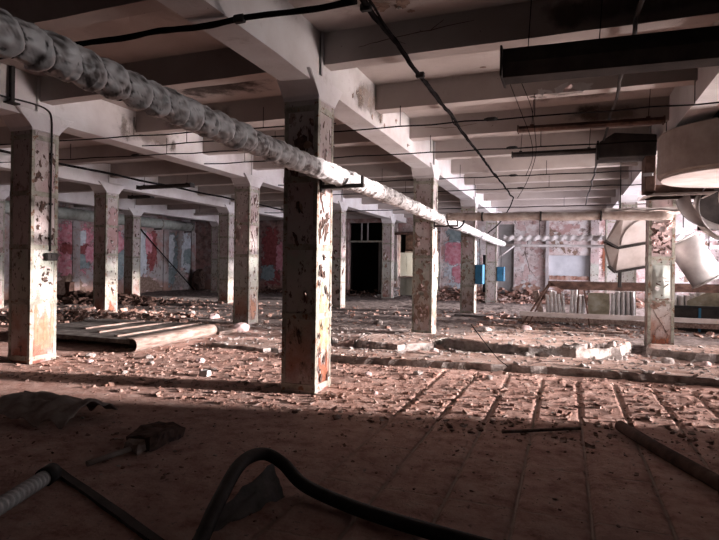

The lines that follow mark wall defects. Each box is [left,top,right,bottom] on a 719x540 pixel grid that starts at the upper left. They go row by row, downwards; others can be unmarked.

peeling [294,118,314,151]
peeling [34,150,56,190]
peeling [36,201,55,244]
peeling [318,189,346,311]
spalling [650,220,673,255]
flaking render [36,256,87,295]
flaking render [133,267,191,292]
peeling [412,231,482,330]
peeling [650,298,672,309]